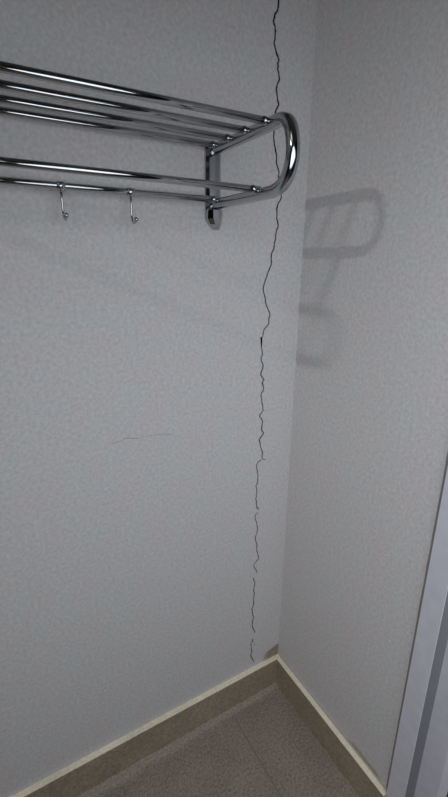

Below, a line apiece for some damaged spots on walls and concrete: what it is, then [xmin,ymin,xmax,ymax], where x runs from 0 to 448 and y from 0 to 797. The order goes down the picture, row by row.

crack [250,0,282,661]